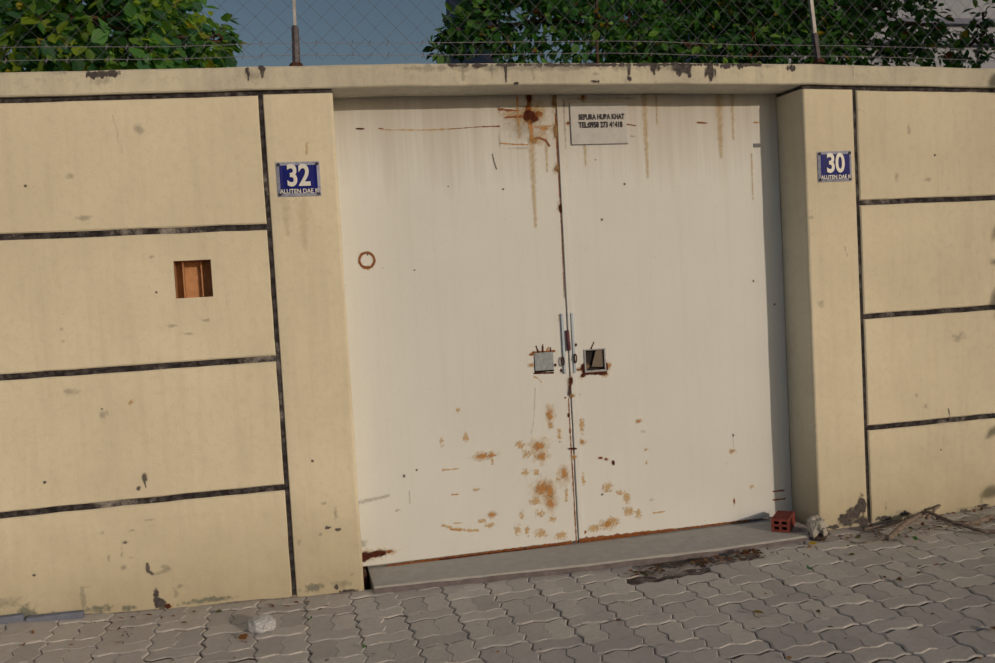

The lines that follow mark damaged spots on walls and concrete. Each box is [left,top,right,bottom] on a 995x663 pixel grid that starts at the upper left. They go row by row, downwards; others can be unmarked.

corrosion [378,95,570,299]
corrosion [362,344,751,567]
flaking render [828,498,868,529]